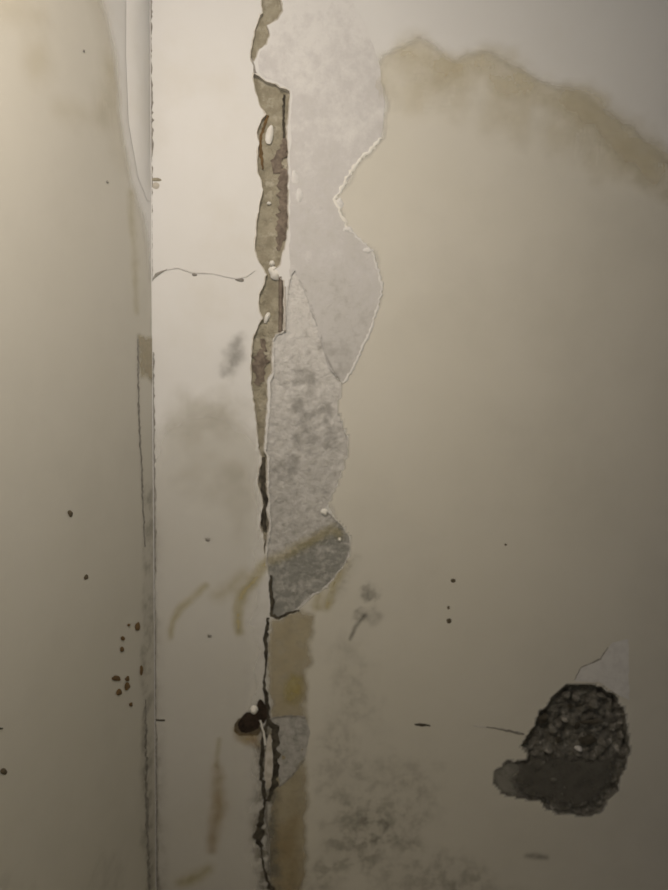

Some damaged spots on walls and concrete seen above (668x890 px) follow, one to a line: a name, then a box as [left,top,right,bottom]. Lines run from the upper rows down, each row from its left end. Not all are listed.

crack [148,0,156,212]
crack [152,0,290,554]
peeling [258,0,385,620]
damp [268,39,668,890]
corrosion [112,676,130,695]
crack [137,337,165,890]
crack [252,618,281,890]
spalling [234,699,310,788]
spalling [493,684,630,817]